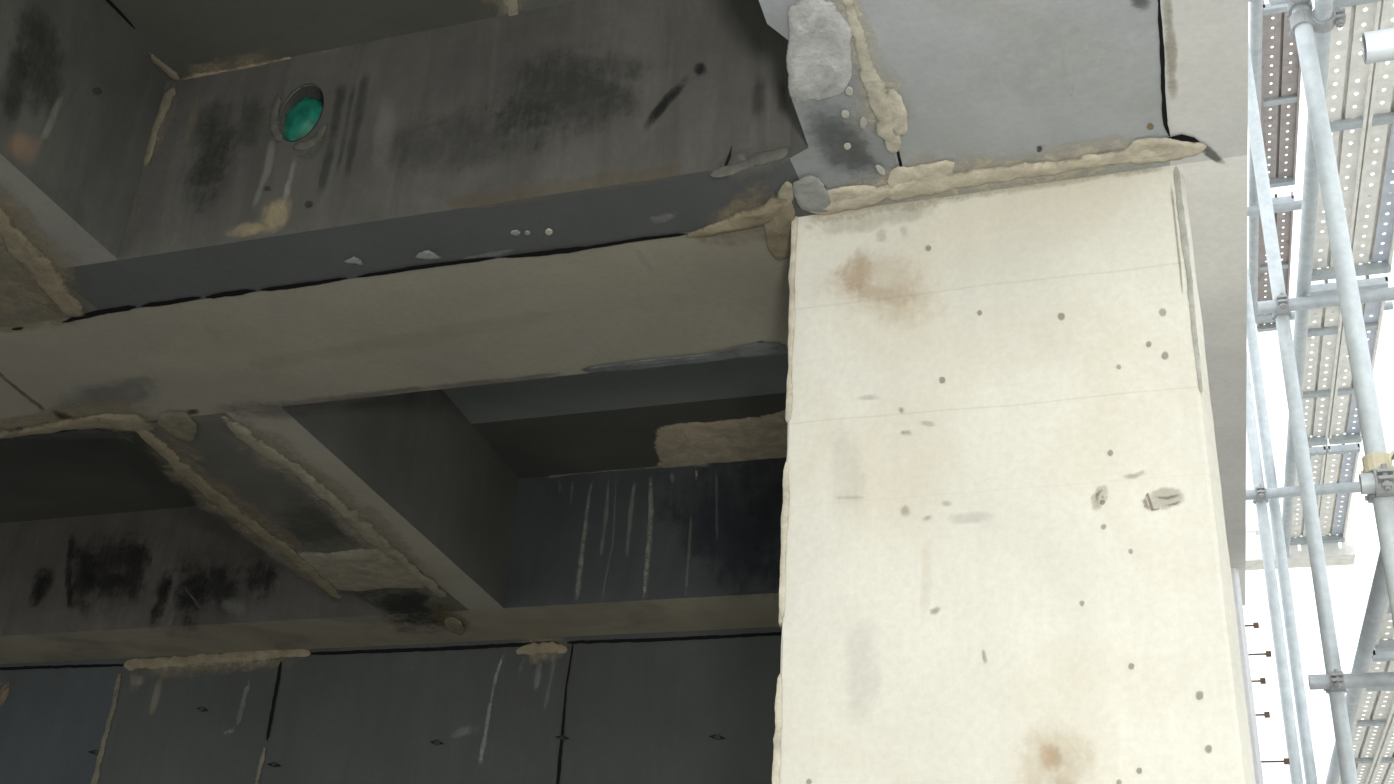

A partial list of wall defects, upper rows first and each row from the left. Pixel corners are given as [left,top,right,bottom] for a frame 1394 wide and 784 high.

leakage [650,87,680,122]
crack [1158,0,1221,162]
leakage [32,541,73,605]
leakage [644,482,653,593]